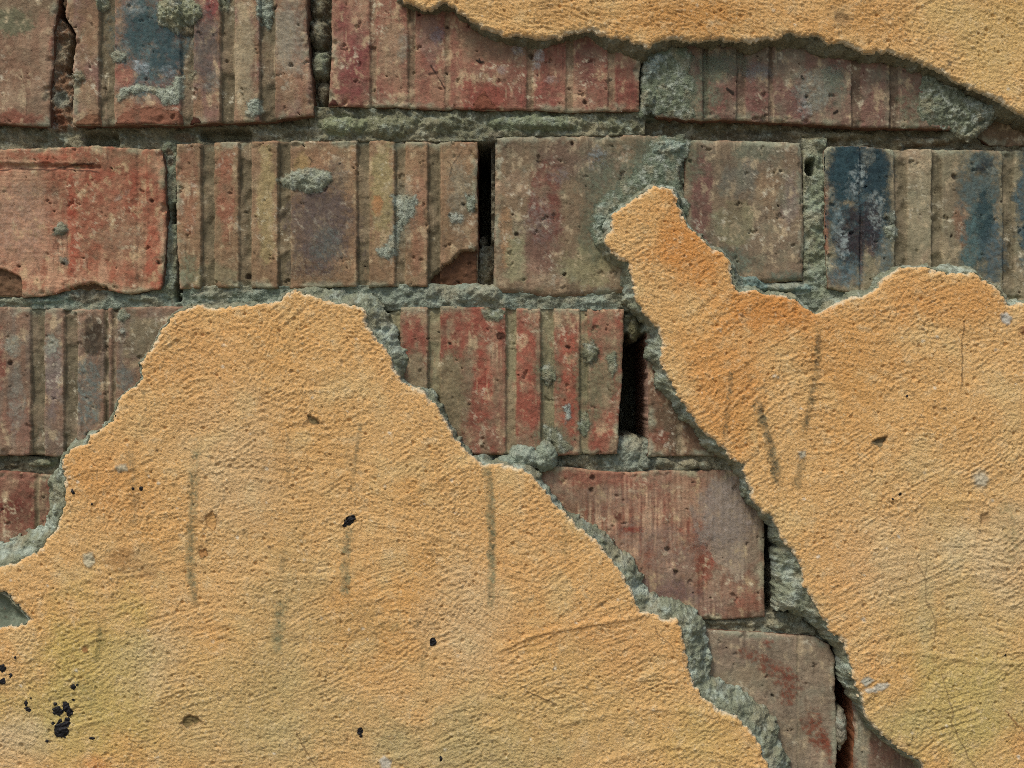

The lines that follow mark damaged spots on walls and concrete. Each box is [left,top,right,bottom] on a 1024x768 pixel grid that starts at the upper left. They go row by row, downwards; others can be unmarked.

peeling [640,53,666,108]
spalling [116,107,201,126]
peeling [964,101,995,142]
peeling [651,139,686,154]
peeling [465,193,476,212]
spalling [0,269,23,297]
spalling [430,250,478,285]
peeling [543,404,591,453]
spalling [0,594,28,627]
peeling [861,677,889,693]
peeling [45,699,75,743]
hole [183,716,201,728]